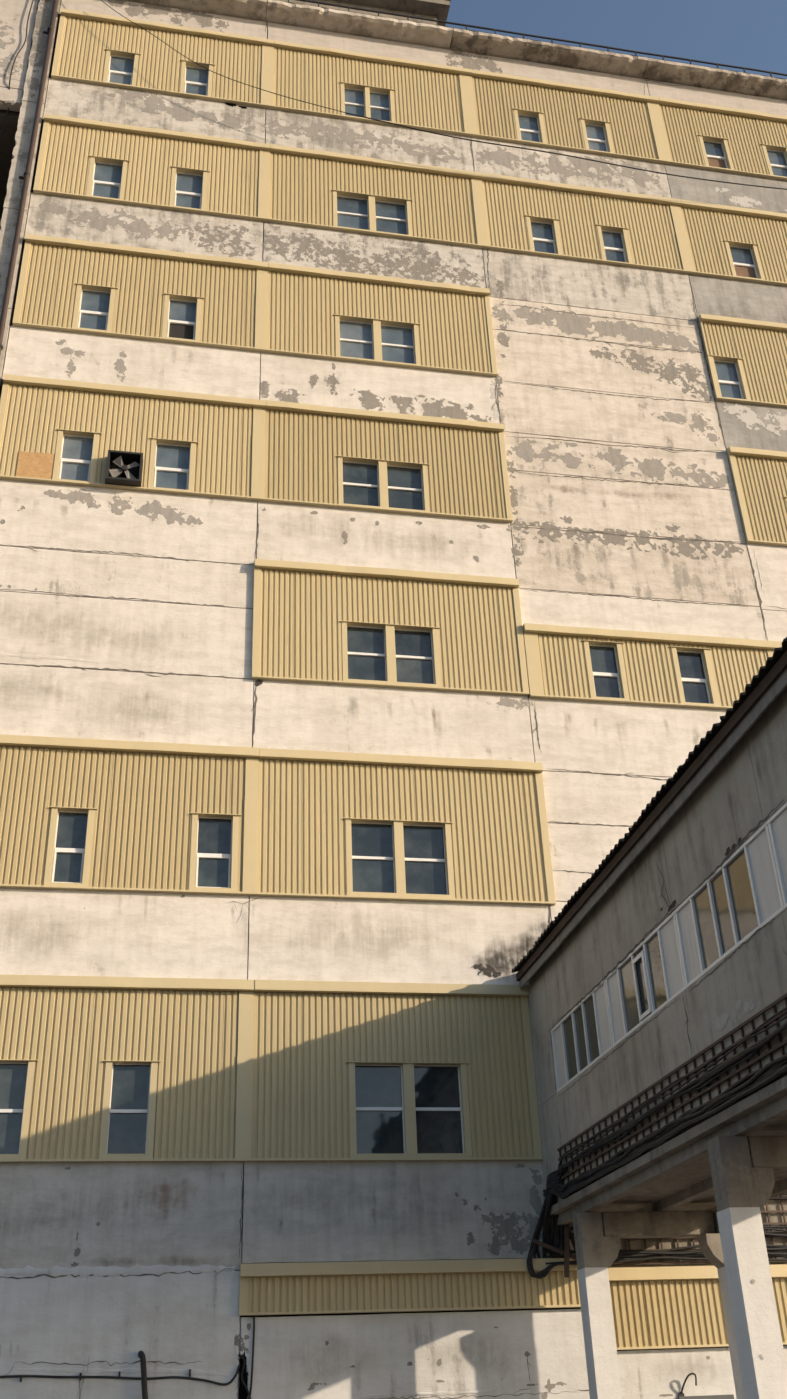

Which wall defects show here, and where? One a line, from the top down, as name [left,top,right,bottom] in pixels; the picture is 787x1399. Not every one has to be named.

peeling [0,0,49,105]
peeling [445,49,503,73]
peeling [106,88,459,163]
peeling [476,146,662,189]
peeling [714,187,762,208]
peeling [39,200,787,446]
peeling [44,489,204,525]
peeling [506,439,744,566]
leakage [479,939,530,974]
crack [0,1165,245,1279]
peeling [454,1164,543,1256]